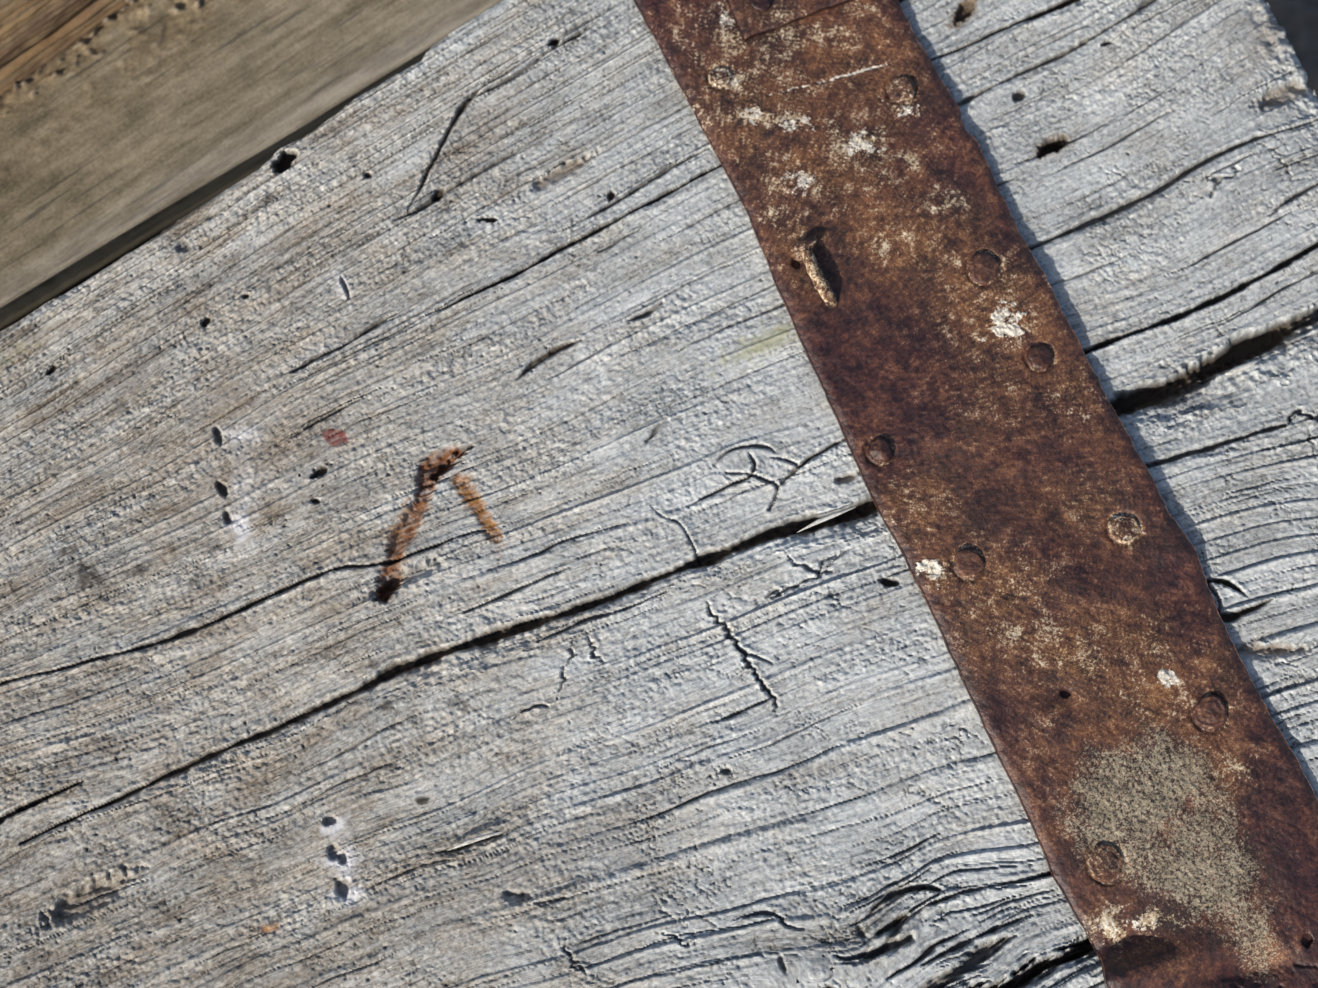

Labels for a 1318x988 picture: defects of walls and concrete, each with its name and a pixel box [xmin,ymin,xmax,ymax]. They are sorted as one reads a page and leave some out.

crack [390,17,603,223]
crack [1082,237,1318,475]
rust [370,440,520,606]
crack [0,437,889,848]
rust [664,713,984,813]
crack [428,832,506,858]
crack [526,894,599,986]
crack [661,927,700,949]
crack [731,907,807,931]
crack [831,869,1103,988]